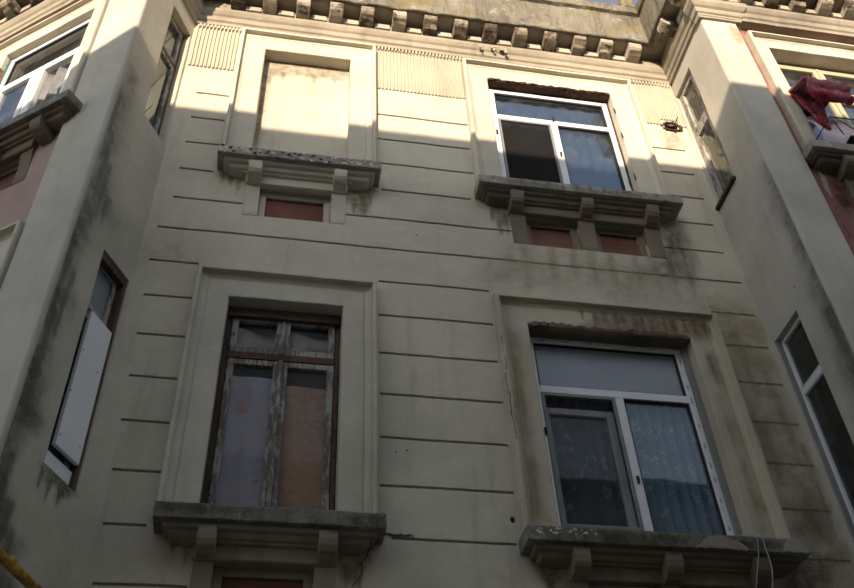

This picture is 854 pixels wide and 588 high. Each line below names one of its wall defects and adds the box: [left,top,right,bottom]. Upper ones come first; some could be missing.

damp [0,93,125,554]